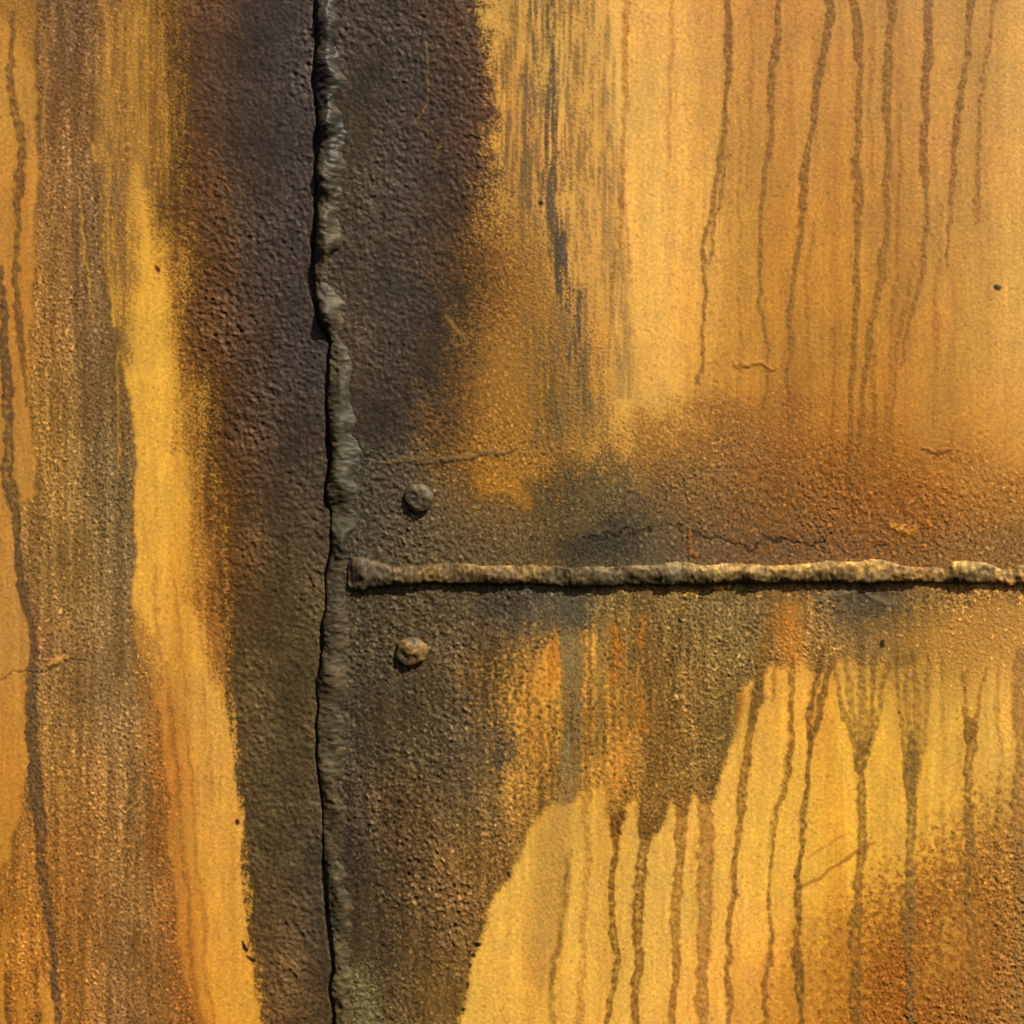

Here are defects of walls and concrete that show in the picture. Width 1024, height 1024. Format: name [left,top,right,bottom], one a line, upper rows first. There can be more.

corrosion [770,739,795,868]
corrosion [815,738,873,984]
corrosion [903,732,923,846]
corrosion [935,819,963,848]
corrosion [963,694,982,791]
corrosion [609,921,621,991]
corrosion [761,950,773,1017]
corrosion [771,930,820,1024]